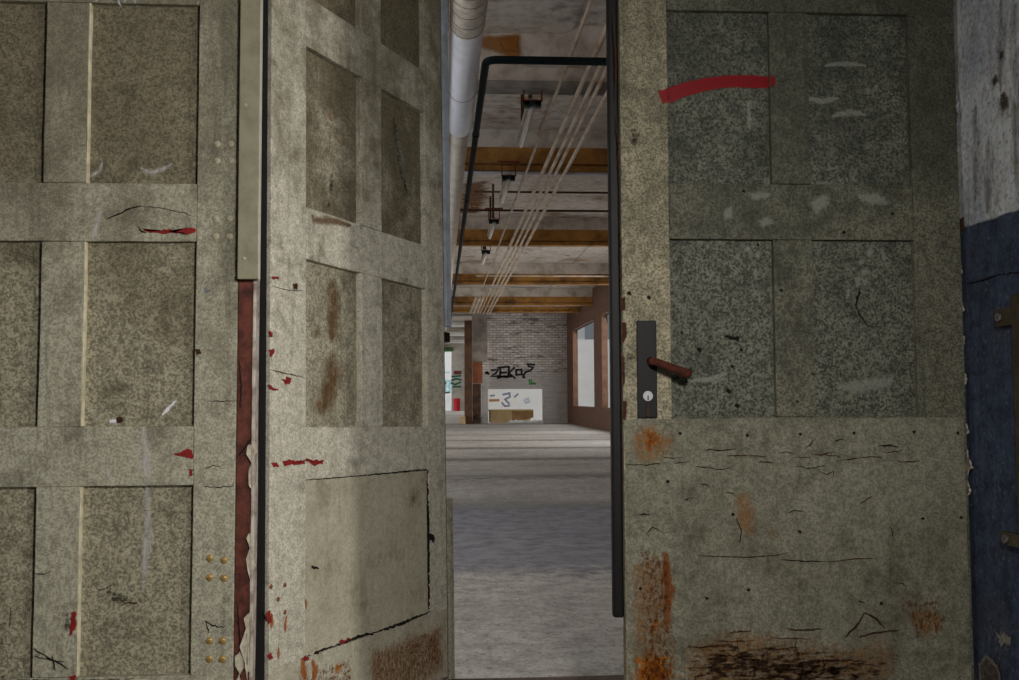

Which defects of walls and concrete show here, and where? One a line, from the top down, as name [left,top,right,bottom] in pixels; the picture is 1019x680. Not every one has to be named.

peeling [992,74,1008,114]
crack [106,206,194,220]
peeling [236,439,258,488]
peeling [246,533,256,578]
rust [628,547,888,680]
crack [2,612,68,669]
peeling [235,606,253,680]
rust [300,659,351,680]